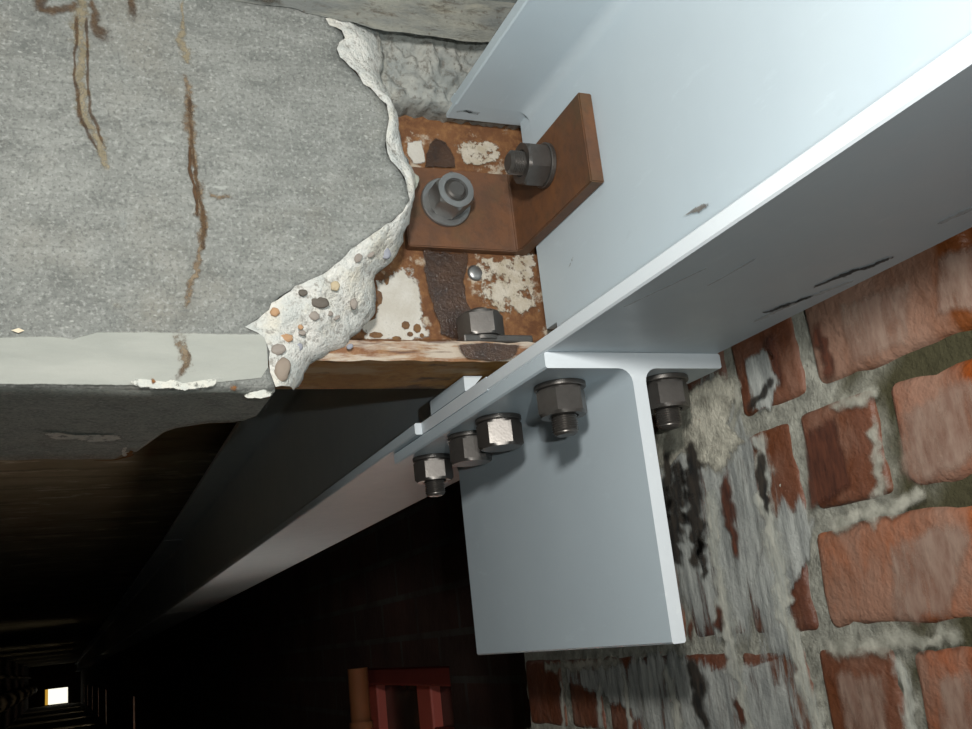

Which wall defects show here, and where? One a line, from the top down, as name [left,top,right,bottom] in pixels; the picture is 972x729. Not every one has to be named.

corrosion [35,0,77,14]
corrosion [425,138,455,168]
spalling [245,18,521,398]
peeling [130,379,217,391]
corrosion [422,249,519,361]
leakage [813,324,834,377]
efflorescence [843,285,907,357]
efflorescence [939,249,972,311]
efflorescence [903,382,972,478]
leakage [545,334,878,729]
leakage [831,487,923,532]
leakage [827,526,972,729]